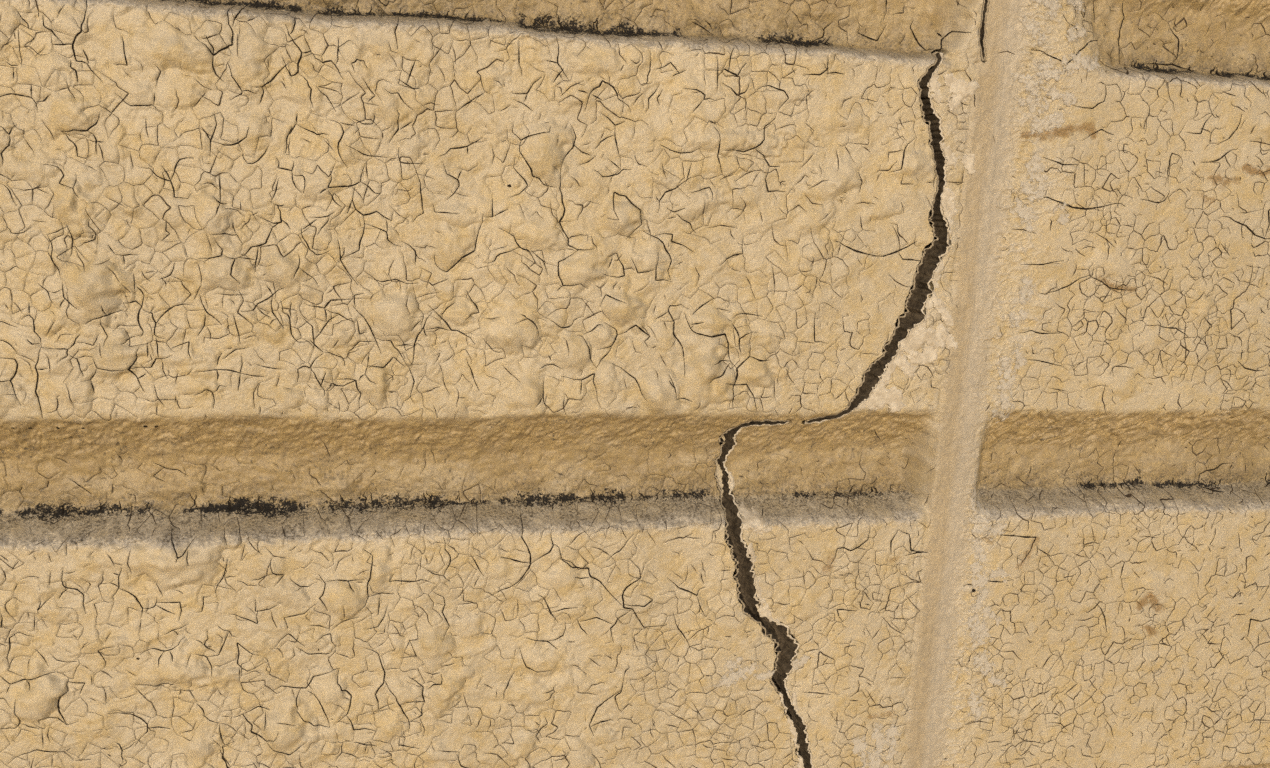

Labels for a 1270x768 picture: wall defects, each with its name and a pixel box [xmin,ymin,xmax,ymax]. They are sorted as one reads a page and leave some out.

crack [945,436,1270,768]